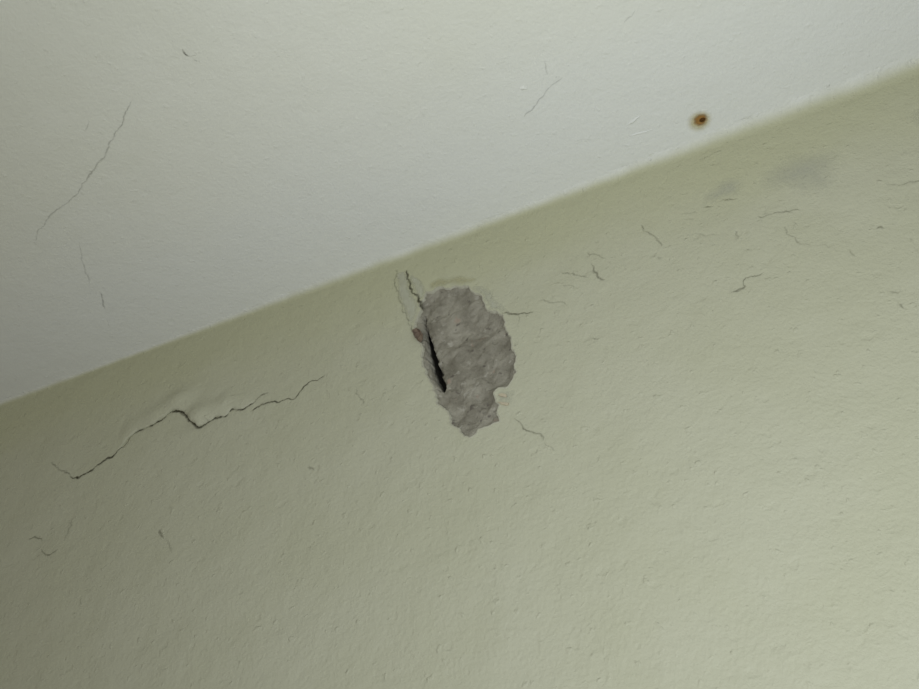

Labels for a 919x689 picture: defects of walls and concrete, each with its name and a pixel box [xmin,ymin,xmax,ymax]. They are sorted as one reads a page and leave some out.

corrosion [692,114,707,127]
flaking render [398,272,517,438]
crack [72,377,322,479]